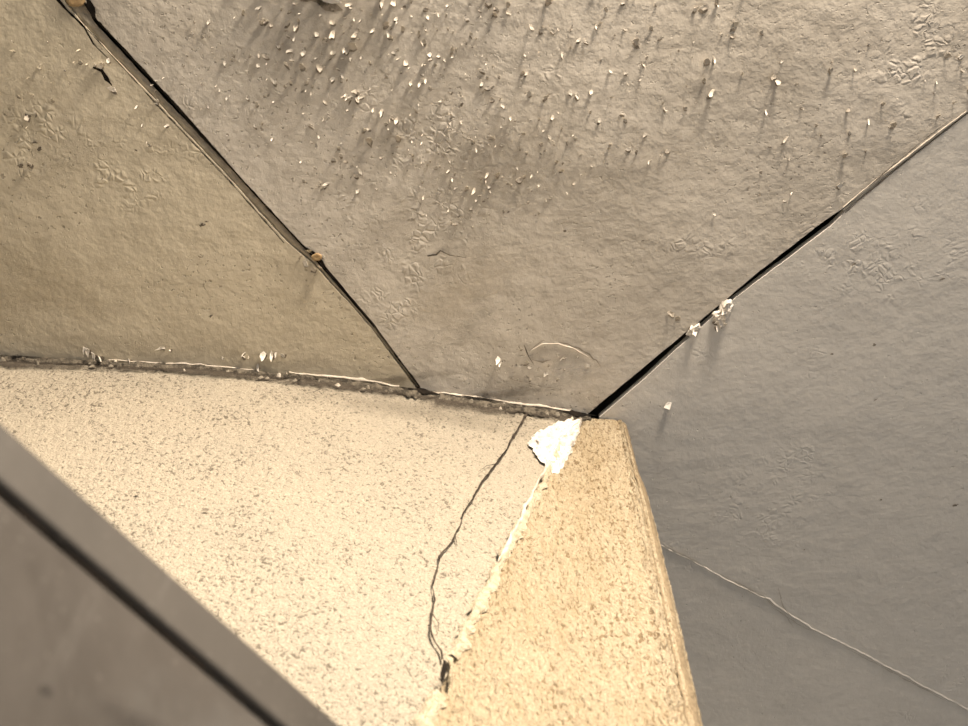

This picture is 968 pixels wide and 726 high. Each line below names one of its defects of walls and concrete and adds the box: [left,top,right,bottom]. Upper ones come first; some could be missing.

peeling [692,0,719,14]
peeling [223,51,270,71]
peeling [233,0,519,153]
peeling [529,24,589,59]
peeling [614,28,648,85]
peeling [372,104,540,226]
peeling [667,299,734,337]
crack [510,340,601,388]
crack [429,412,529,659]
spalling [446,418,582,660]
crack [660,543,968,711]
spalling [407,689,447,726]